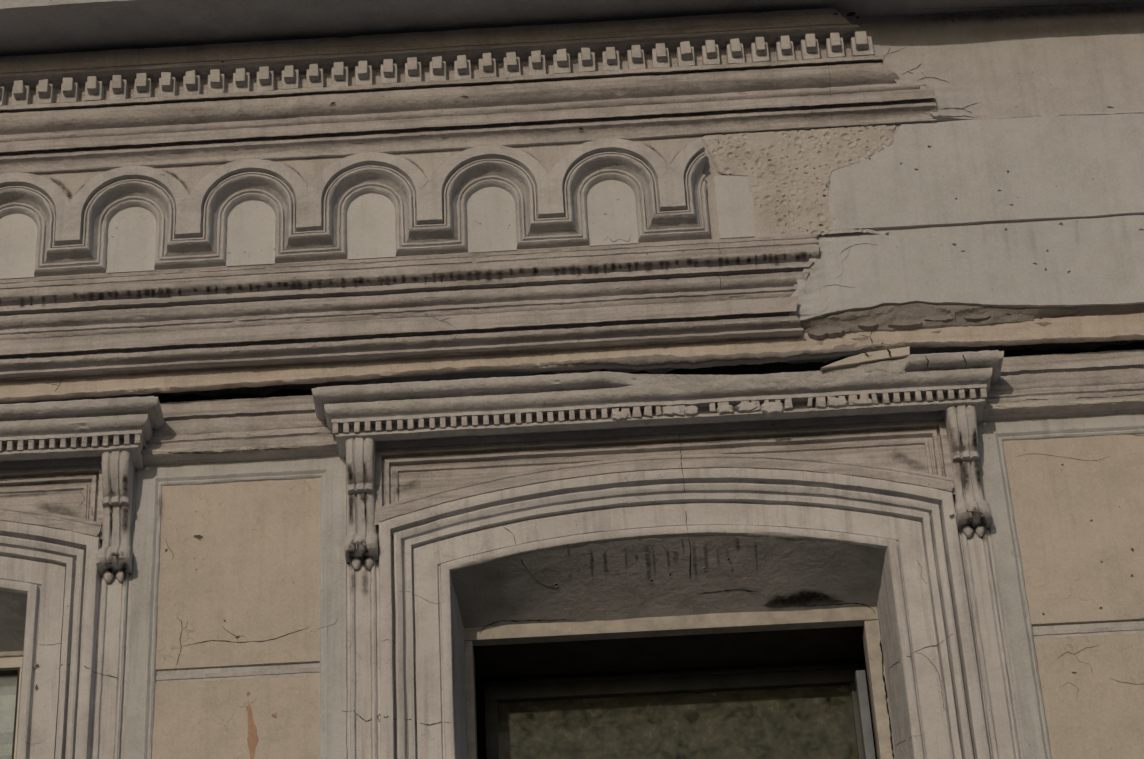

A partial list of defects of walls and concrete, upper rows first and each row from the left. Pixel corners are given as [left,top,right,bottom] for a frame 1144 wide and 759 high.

crack [886,47,977,118]
flaking render [702,125,896,238]
flaking render [804,304,1052,349]
peeling [764,591,845,608]
crack [176,617,339,665]